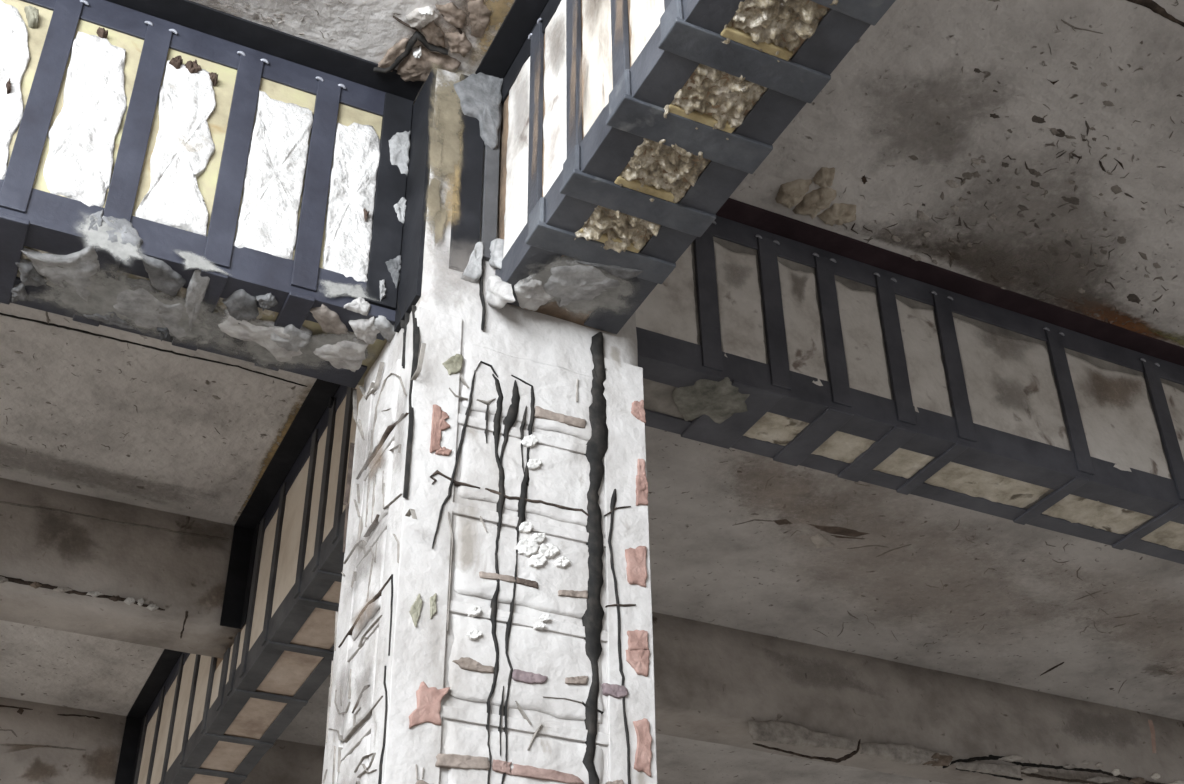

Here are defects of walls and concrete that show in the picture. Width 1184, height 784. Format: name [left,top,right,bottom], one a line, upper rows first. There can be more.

spalling [24,6,39,29]
spalling [169,55,218,87]
spalling [373,0,504,150]
crack [1048,19,1103,53]
crack [1127,0,1184,27]
peeling [11,246,100,302]
peeling [83,210,210,342]
peeling [218,255,401,372]
crack [478,257,486,330]
peeling [461,238,643,311]
crack [322,318,636,784]